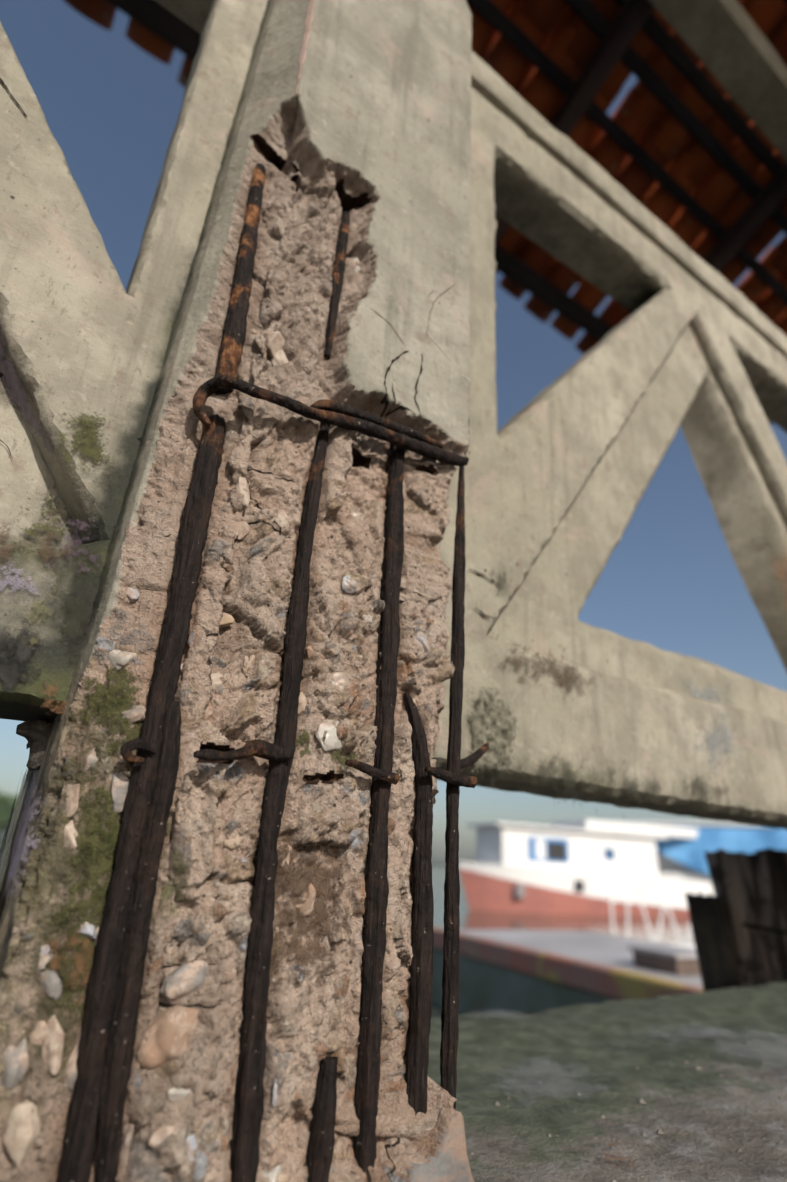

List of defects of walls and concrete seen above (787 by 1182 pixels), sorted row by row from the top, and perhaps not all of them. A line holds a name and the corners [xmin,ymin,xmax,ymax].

crack [0,78,27,117]
crack [371,285,453,418]
spalling [0,0,490,1182]
water stain [0,628,45,693]
water stain [0,770,28,887]